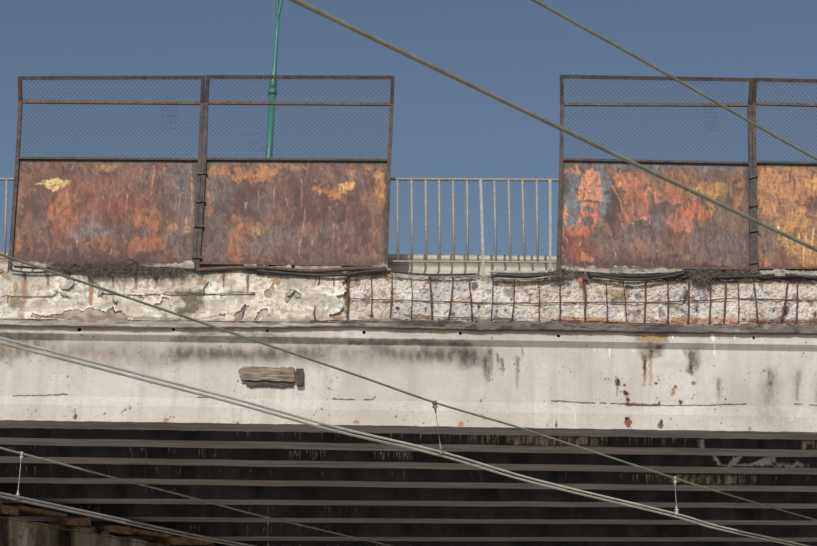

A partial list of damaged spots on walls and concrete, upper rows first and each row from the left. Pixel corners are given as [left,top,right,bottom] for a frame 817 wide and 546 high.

spalling [249,273,275,298]
spalling [285,289,302,302]
spalling [329,271,817,326]
spalling [31,307,131,323]
spalling [234,305,268,323]
corrosion [661,306,817,324]
damp [161,328,287,359]
damp [349,339,476,366]
corrosion [637,334,668,385]
damp [688,351,697,374]
corrosion [615,378,660,406]
damp [646,456,803,485]